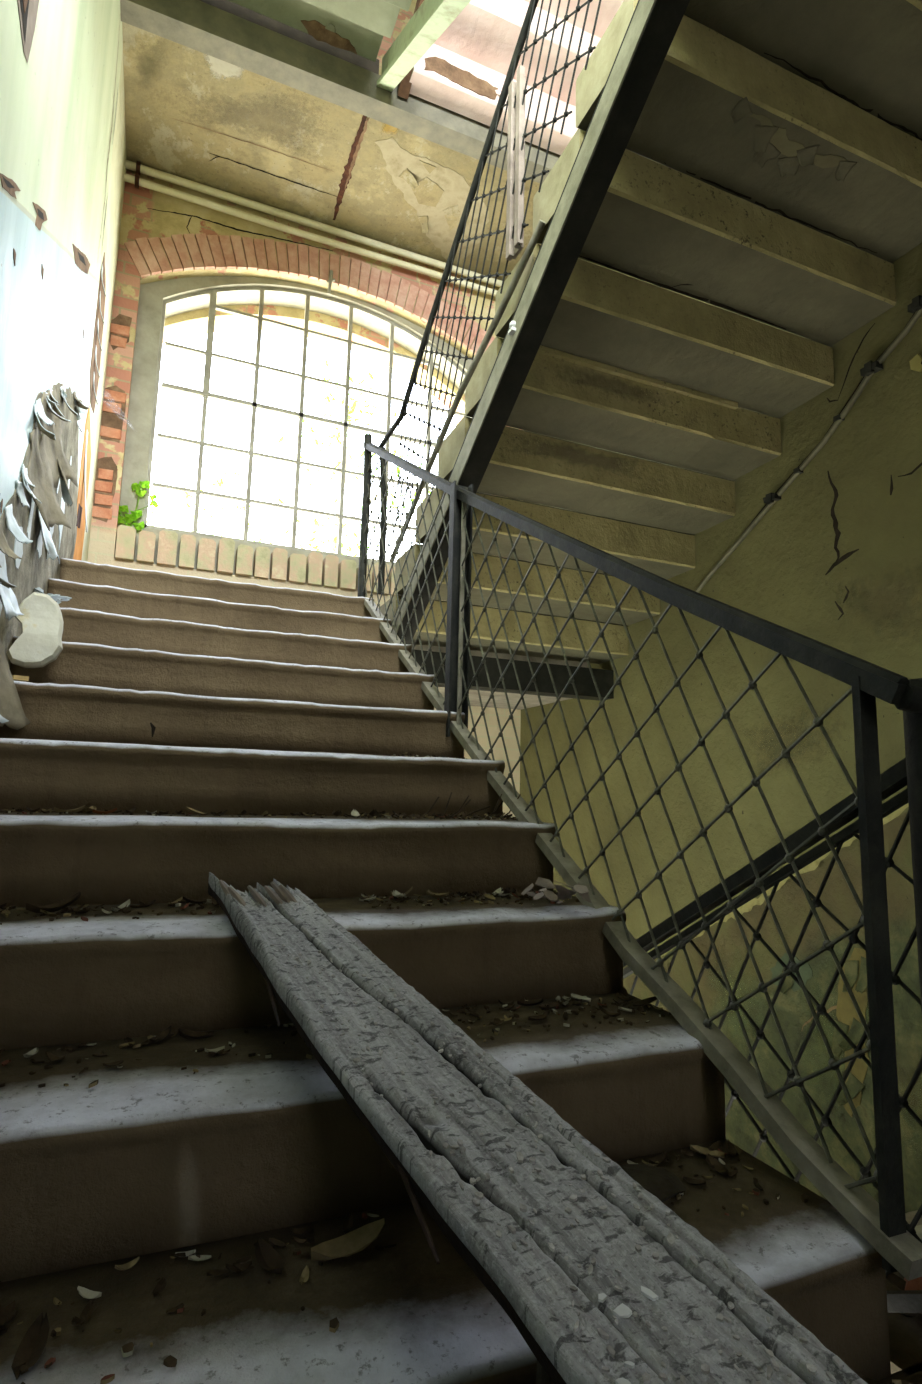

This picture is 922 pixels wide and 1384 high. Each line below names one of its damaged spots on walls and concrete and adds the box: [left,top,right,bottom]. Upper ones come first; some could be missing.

flaking render [17,0,39,63]
flaking render [301,20,357,54]
flaking render [0,173,48,231]
flaking render [375,137,489,263]
peeling [0,244,132,730]
crack [890,463,922,495]
crack [825,471,859,620]